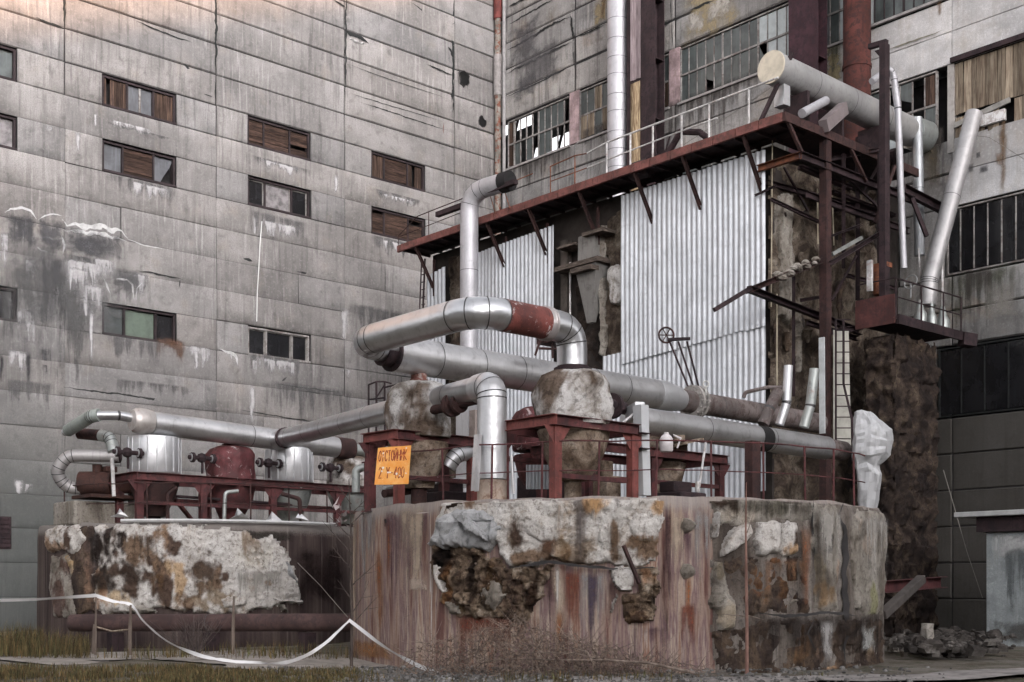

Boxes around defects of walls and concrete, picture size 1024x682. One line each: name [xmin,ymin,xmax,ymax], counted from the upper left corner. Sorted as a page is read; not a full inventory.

leakage [1,206,162,370]
spalling [44,522,303,614]
corrosion [354,640,389,659]
spalling [430,496,665,624]
corrosion [557,572,580,658]
corrosion [610,526,618,548]
corrosion [682,581,694,635]
spalling [708,499,885,674]